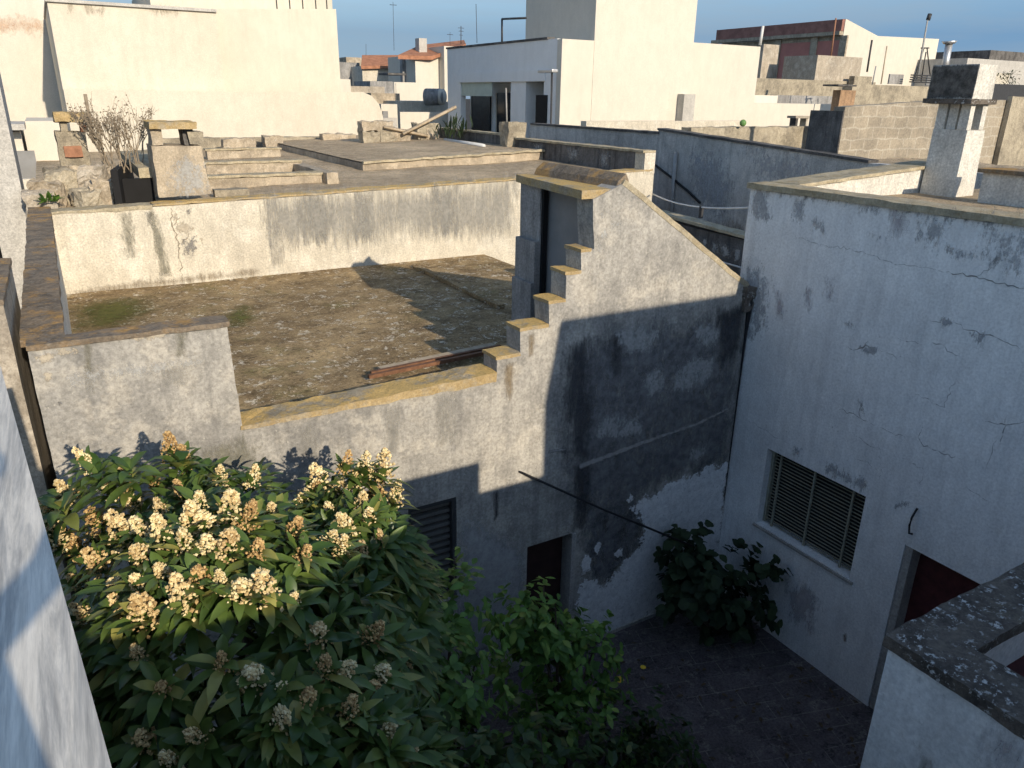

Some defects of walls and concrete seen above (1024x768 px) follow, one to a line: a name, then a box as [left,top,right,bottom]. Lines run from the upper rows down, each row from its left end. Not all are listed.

water stain [109,212,221,290]
crack [170,210,189,275]
water stain [268,185,510,242]
crack [803,238,1023,289]
crack [851,321,1019,359]
peeling [574,446,730,636]